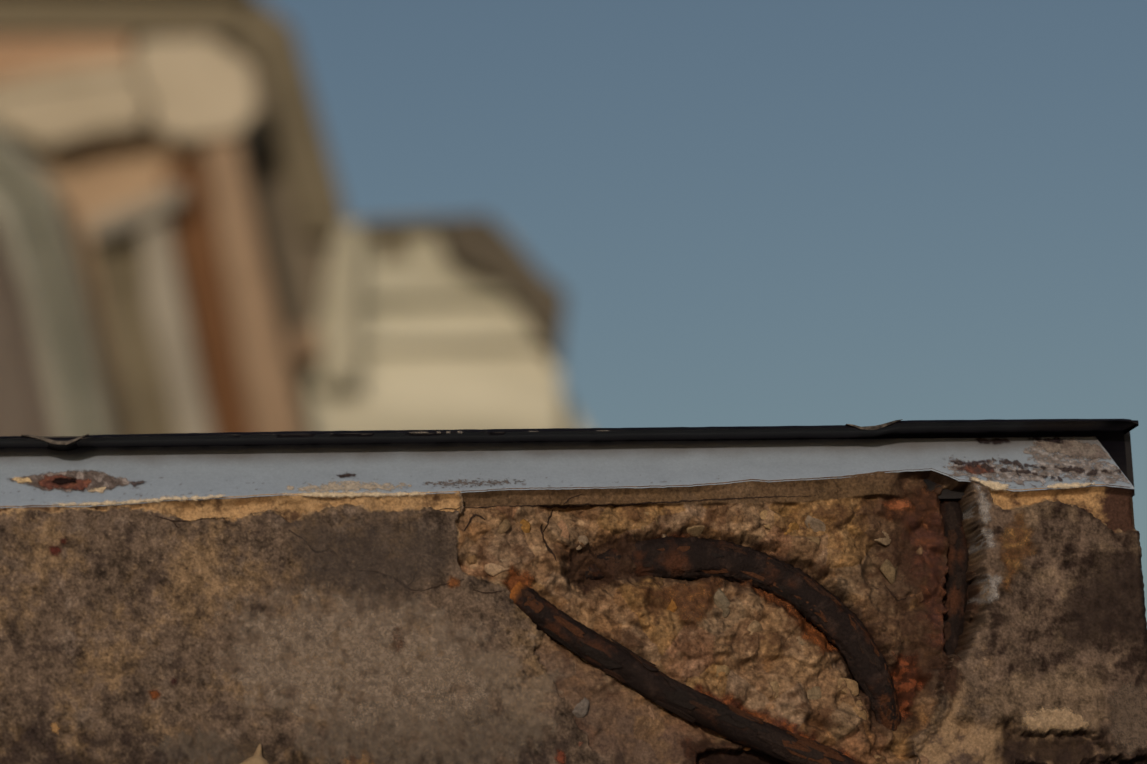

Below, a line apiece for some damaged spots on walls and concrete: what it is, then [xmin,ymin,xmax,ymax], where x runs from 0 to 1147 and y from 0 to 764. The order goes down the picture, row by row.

rust [38,474,91,490]
rust [503,565,585,654]
spalling [0,436,1137,764]
rust [646,569,835,652]
rust [861,488,963,731]
rust [611,638,856,764]